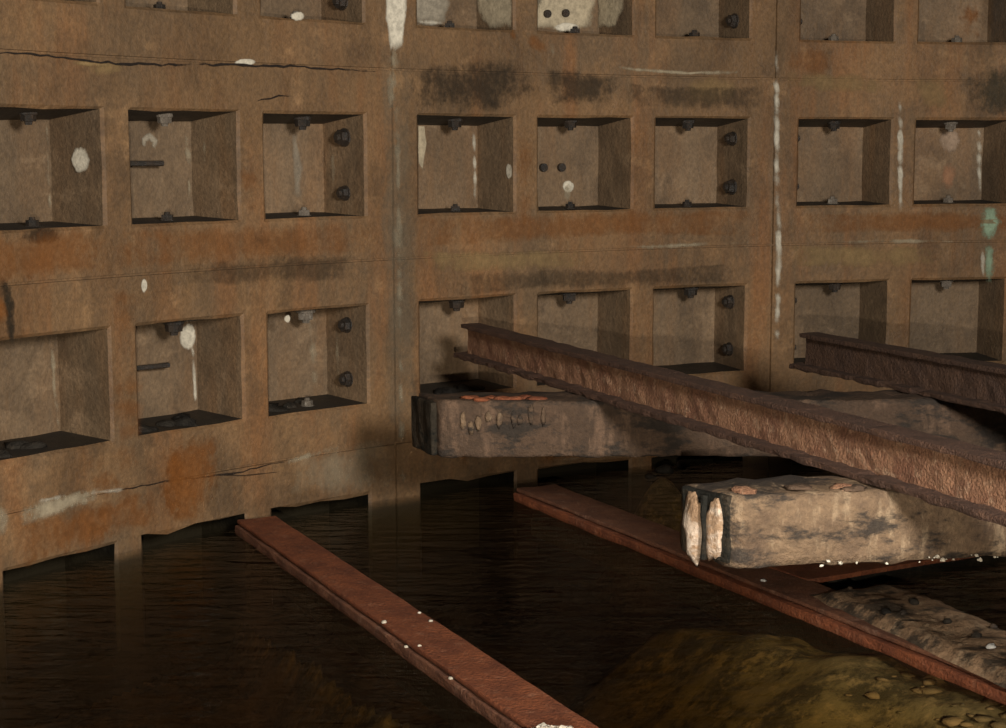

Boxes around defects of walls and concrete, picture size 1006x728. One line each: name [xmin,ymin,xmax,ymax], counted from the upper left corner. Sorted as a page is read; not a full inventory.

leakage [386,0,406,64]
crack [0,52,375,72]
leakage [425,65,512,108]
leakage [4,286,14,339]